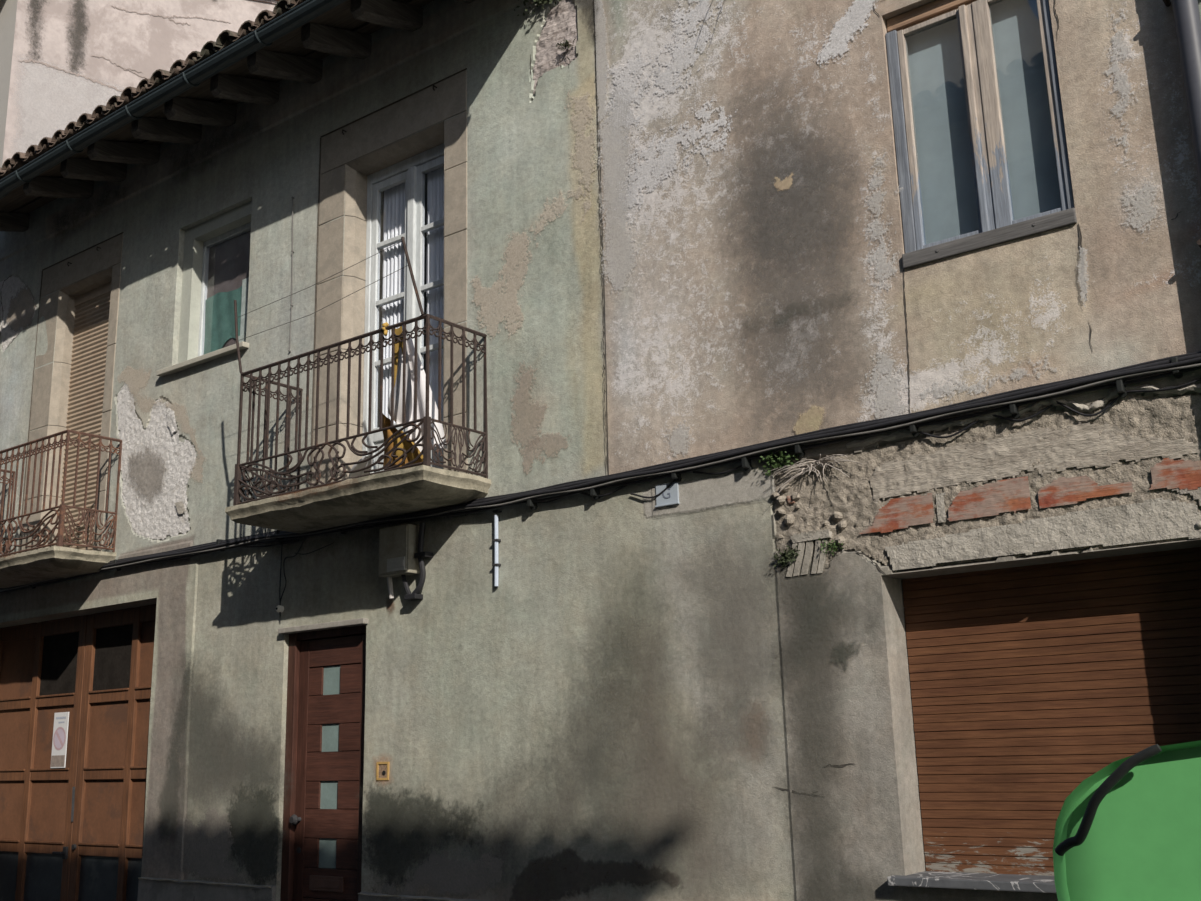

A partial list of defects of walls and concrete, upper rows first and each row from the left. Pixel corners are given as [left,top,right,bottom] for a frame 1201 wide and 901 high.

leakage [30,0,46,58]
leakage [68,0,88,71]
spalling [533,0,578,94]
peeling [814,0,877,68]
leakage [747,116,841,397]
spalling [0,276,36,352]
peeling [864,349,1058,419]
spalling [117,366,206,540]
spalling [643,393,1201,577]
leakage [160,670,285,890]
leakage [360,684,621,890]
leakage [510,848,684,901]